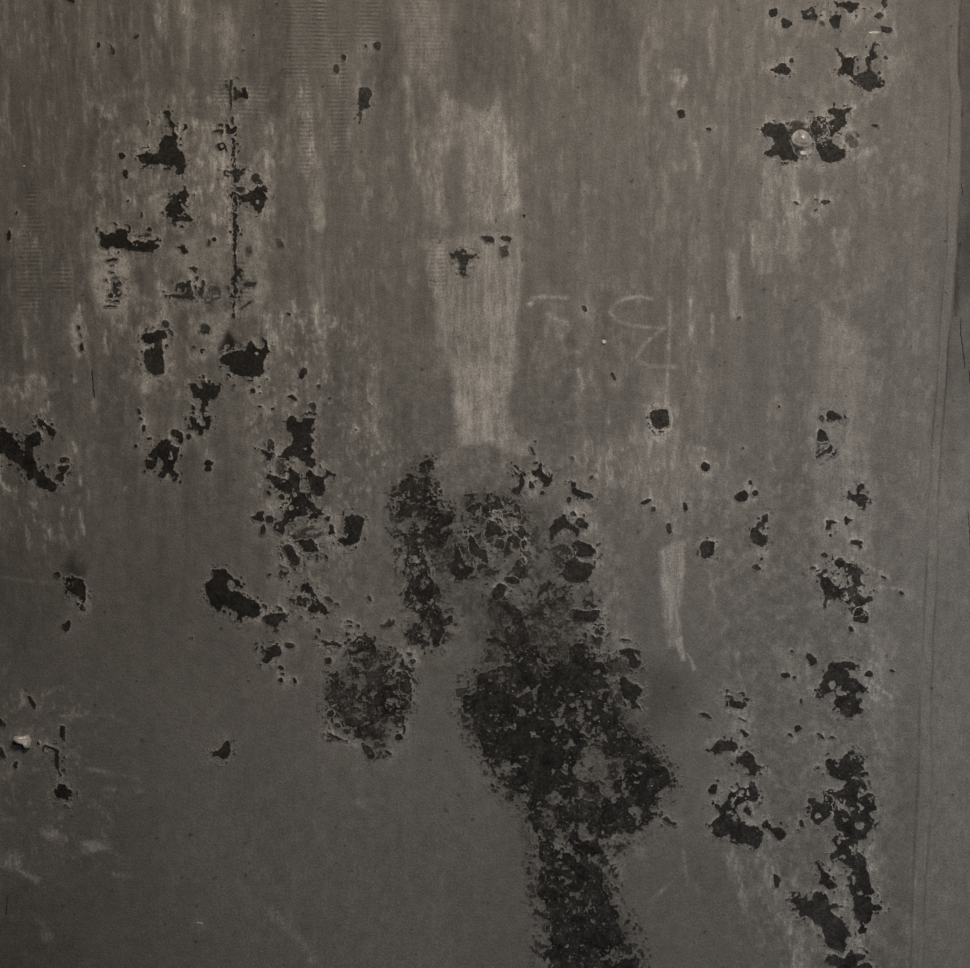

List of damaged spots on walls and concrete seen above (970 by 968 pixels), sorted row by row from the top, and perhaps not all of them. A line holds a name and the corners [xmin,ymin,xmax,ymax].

peeling [754,0,895,171]
peeling [92,104,221,309]
peeling [223,171,276,220]
peeling [0,413,76,500]
peeling [813,405,850,466]
peeling [132,232,687,968]
peeling [779,671,798,681]
peeling [788,648,876,726]
peeling [807,477,888,635]
peeling [697,688,890,968]